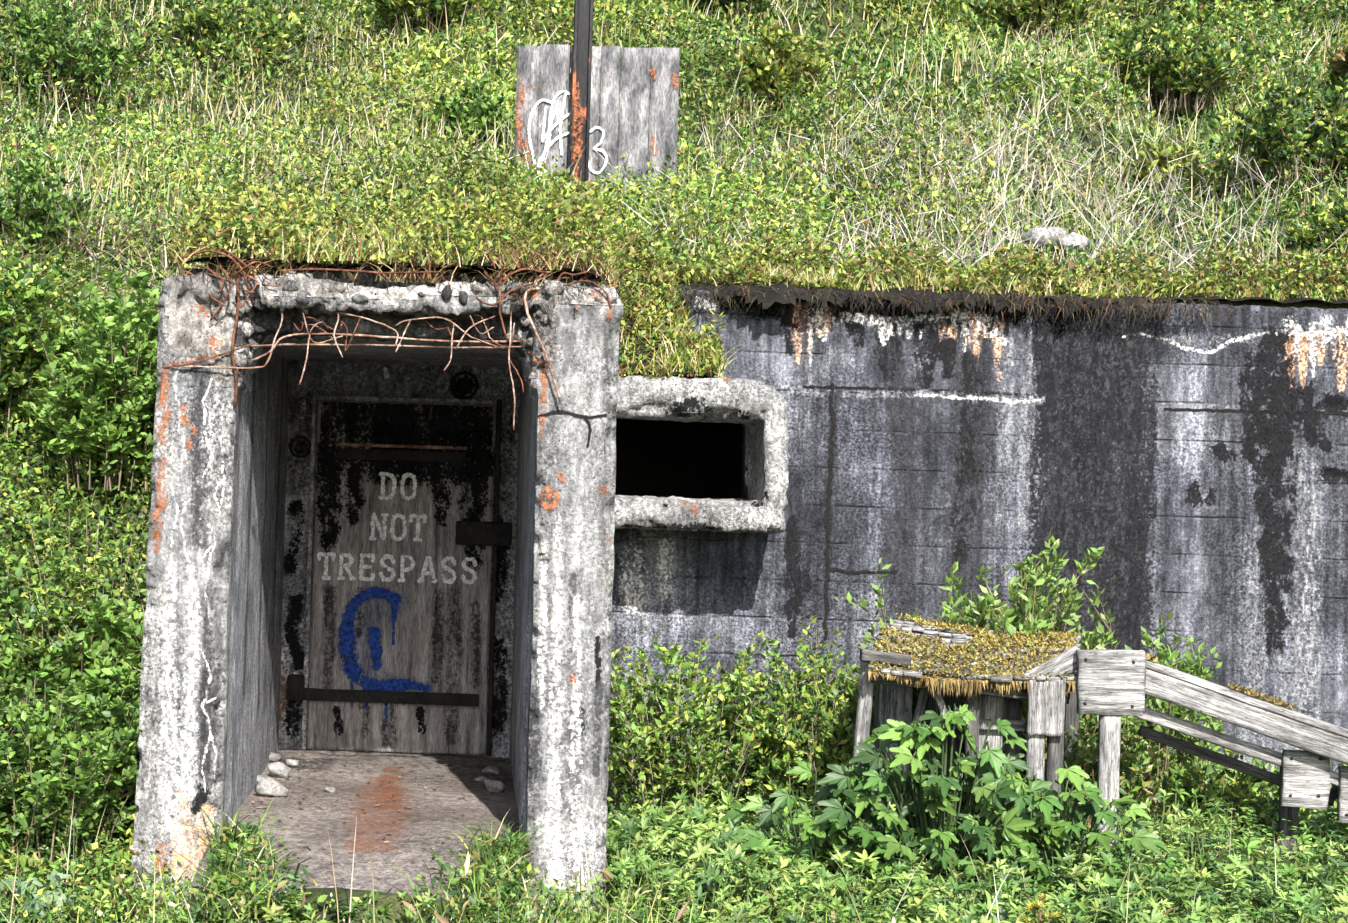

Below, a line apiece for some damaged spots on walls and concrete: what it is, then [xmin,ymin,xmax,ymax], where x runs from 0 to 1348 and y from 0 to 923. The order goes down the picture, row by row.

corrosion [792,302,834,364]
corrosion [879,322,922,346]
corrosion [938,309,1007,358]
corrosion [1285,317,1348,392]
corrosion [528,351,548,439]
corrosion [151,335,221,552]
corrosion [539,471,566,510]
damp [1210,324,1333,656]
corrosion [155,785,213,878]